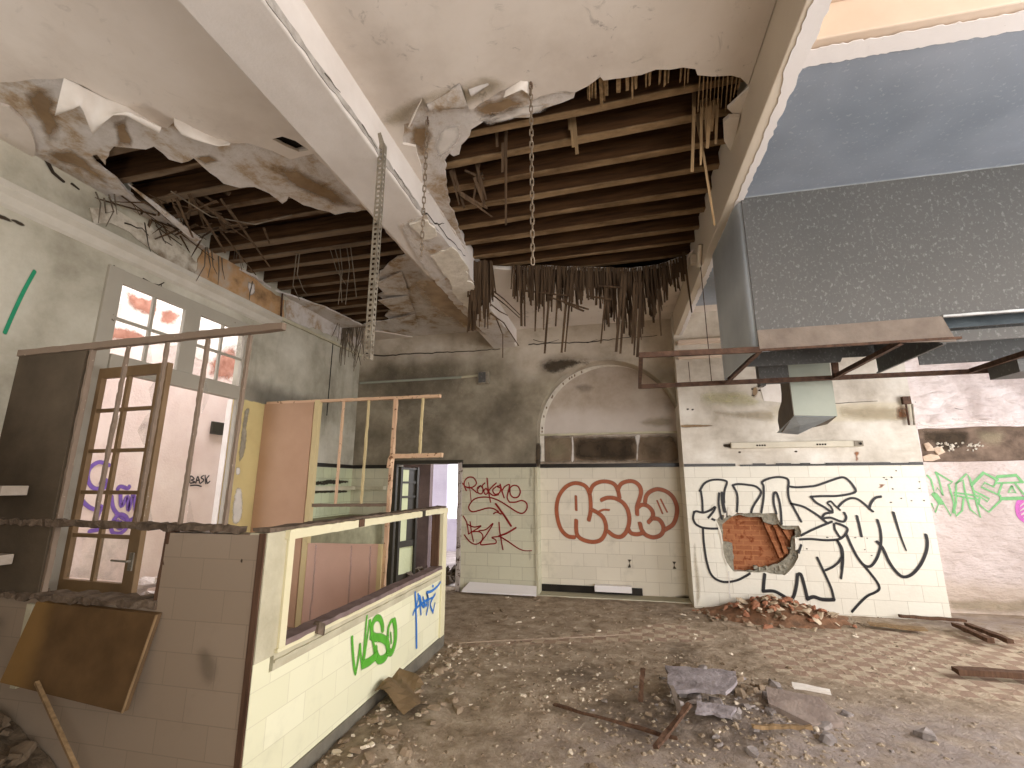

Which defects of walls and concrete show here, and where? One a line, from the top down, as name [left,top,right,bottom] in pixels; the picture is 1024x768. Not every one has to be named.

spalling [0,78,575,348]
spalling [679,259,713,335]
peeling [195,317,238,381]
spalling [918,426,1024,462]
spalling [716,504,808,575]